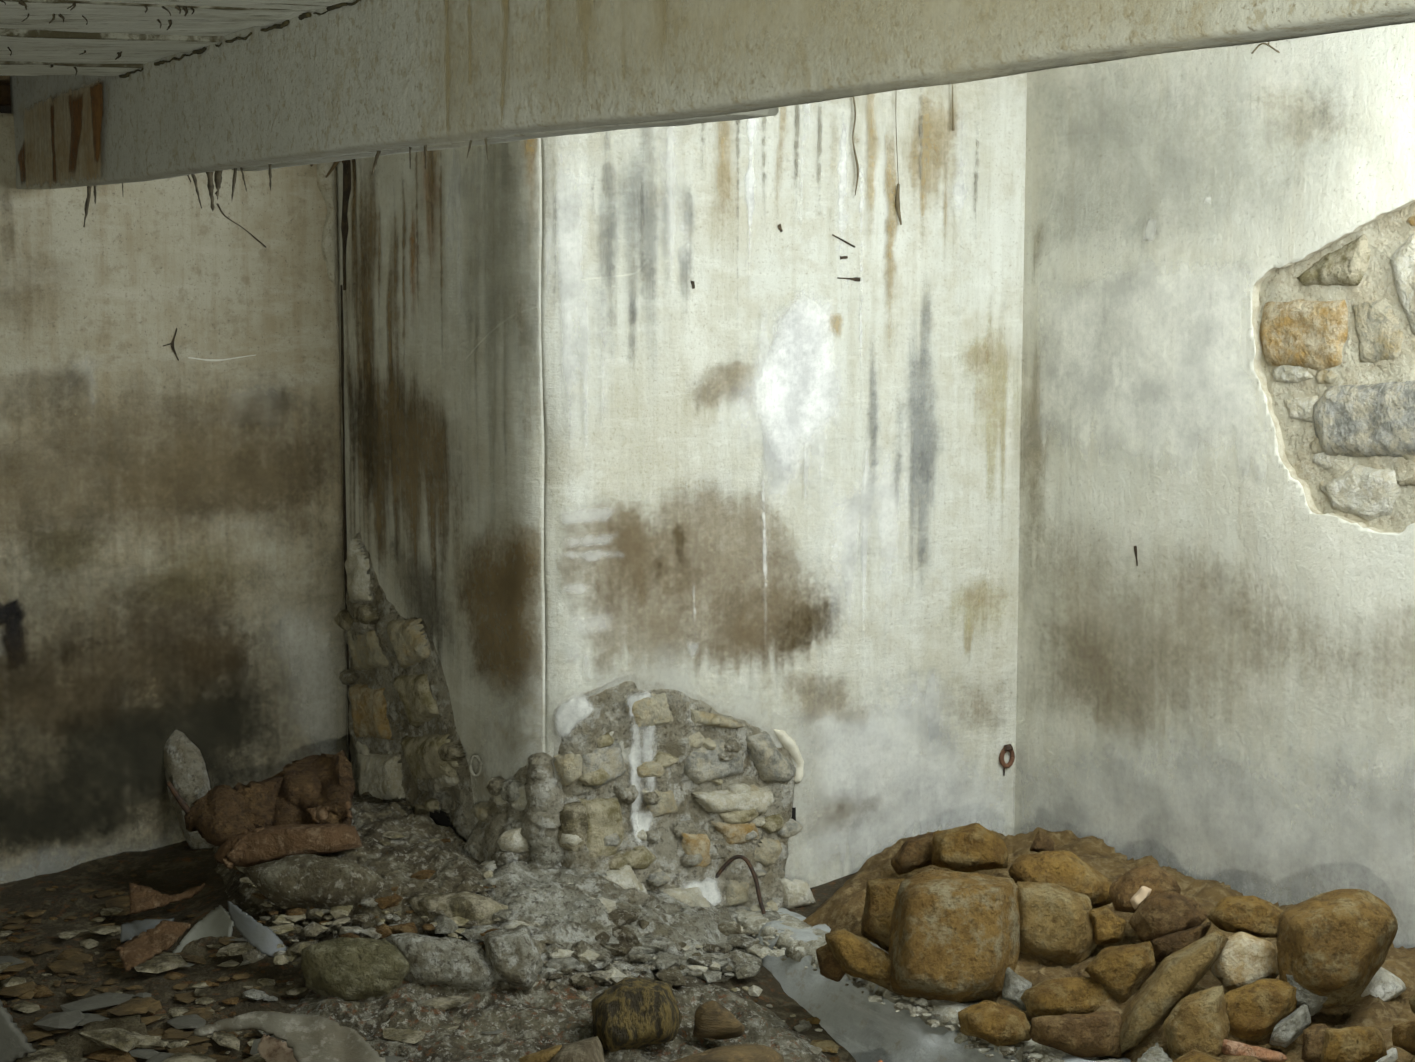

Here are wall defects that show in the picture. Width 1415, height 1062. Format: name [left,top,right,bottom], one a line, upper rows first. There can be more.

water stain [783,104,822,180]
water stain [839,94,897,296]
water stain [346,150,459,650]
water stain [702,299,841,494]
water stain [843,313,936,586]
flaking render [1257,202,1415,533]
water stain [0,586,252,844]
flaking render [334,532,830,968]
water stain [458,494,1000,861]
water stain [686,879,720,906]
spalling [845,973,995,1046]
spalling [1013,1021,1123,1062]